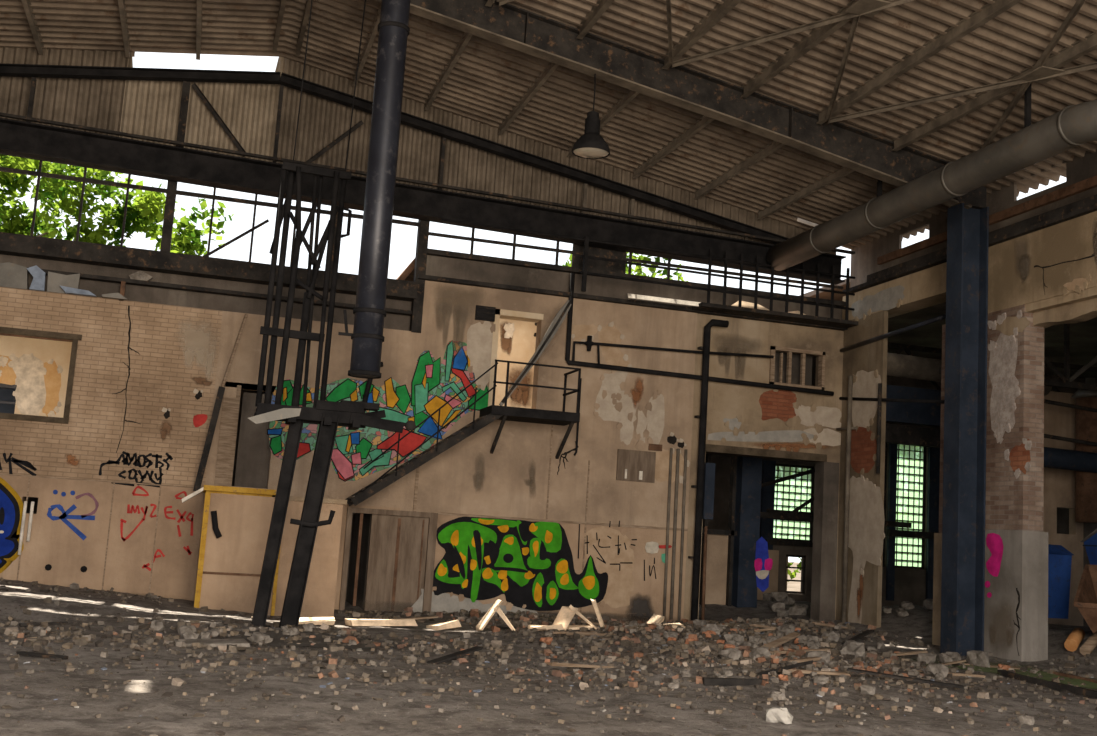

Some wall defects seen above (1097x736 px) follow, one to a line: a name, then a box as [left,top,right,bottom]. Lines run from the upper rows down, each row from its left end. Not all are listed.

peeling [0,353,63,417]
crack [113,306,140,453]
peeling [571,322,690,484]
peeling [988,310,1032,479]
flaking render [706,369,885,624]